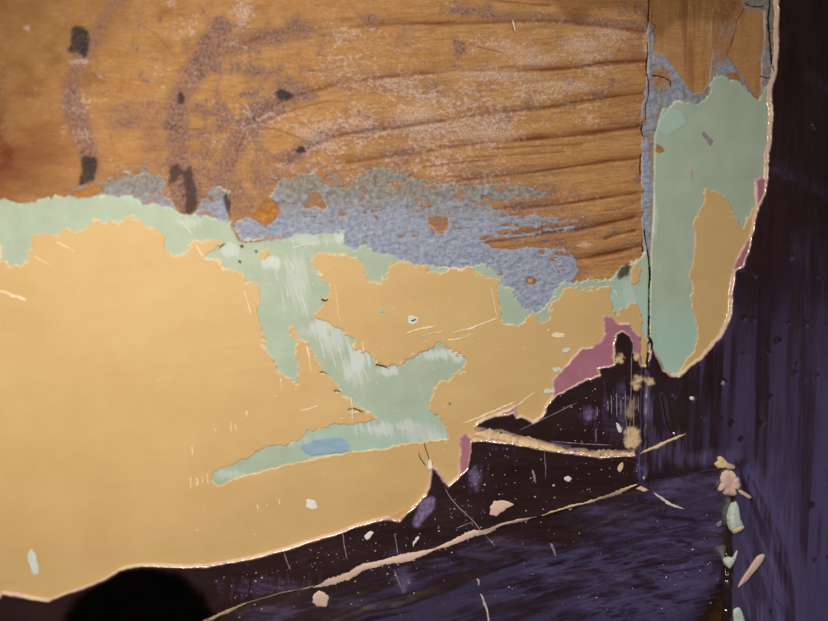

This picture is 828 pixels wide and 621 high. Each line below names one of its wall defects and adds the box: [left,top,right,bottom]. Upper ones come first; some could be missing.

peeling [0,167,651,598]
peeling [0,0,774,485]
crack [643,229,655,378]
crack [639,43,671,174]